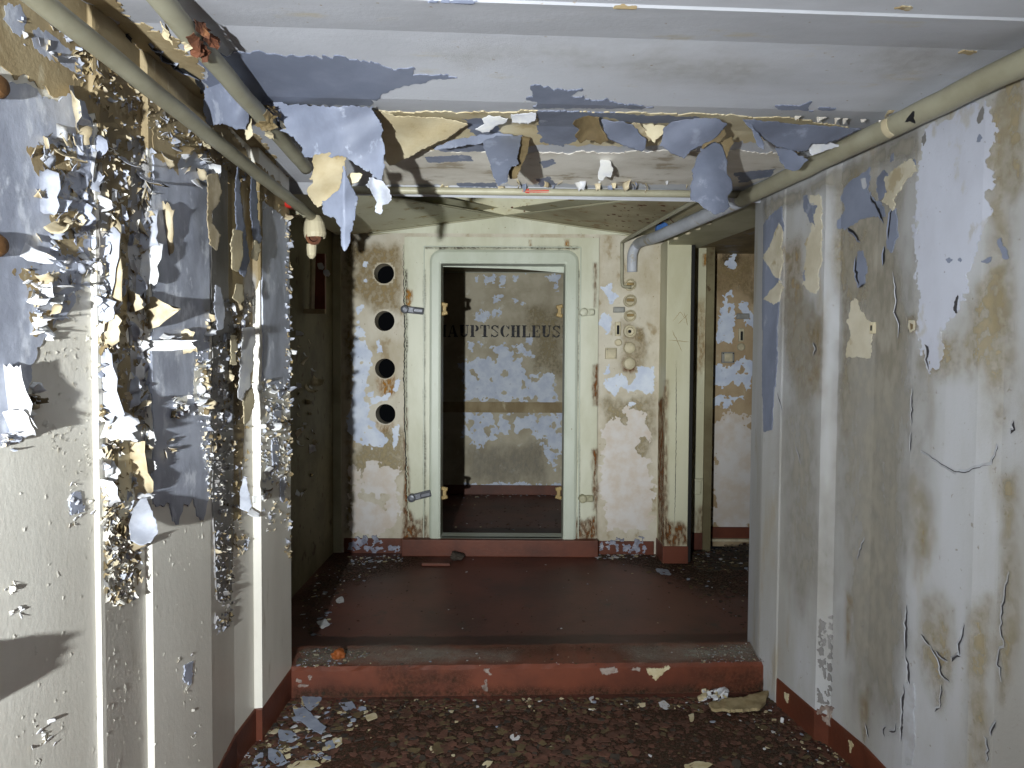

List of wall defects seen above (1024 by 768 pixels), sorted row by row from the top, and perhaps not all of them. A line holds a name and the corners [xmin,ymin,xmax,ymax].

spalling [220,50,849,193]
water stain [989,79,1022,183]
peeling [836,99,1009,374]
peeling [0,0,324,634]
peeling [346,304,403,553]
corrosion [404,440,426,537]
corrosion [576,450,597,538]
corrosion [658,387,687,546]
peeling [711,206,784,527]
crack [909,389,1015,475]
water stain [932,271,1008,381]
crack [996,572,1009,682]